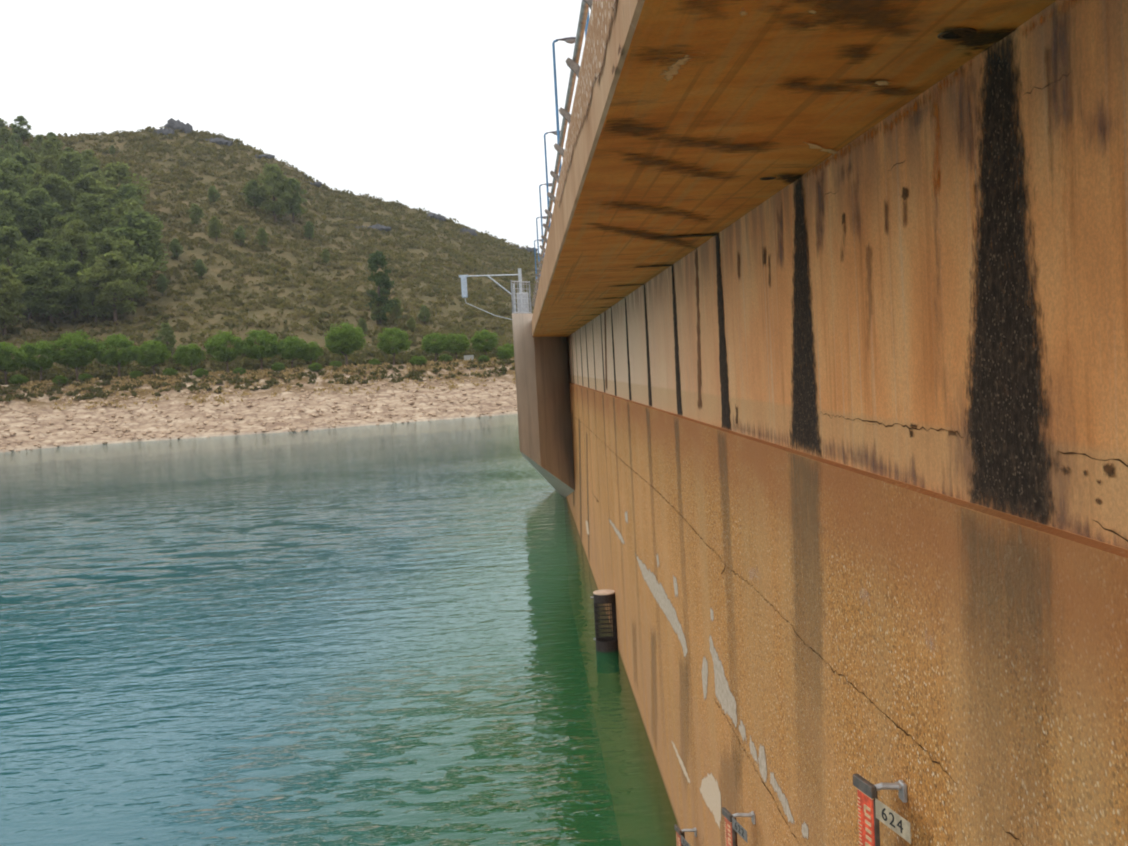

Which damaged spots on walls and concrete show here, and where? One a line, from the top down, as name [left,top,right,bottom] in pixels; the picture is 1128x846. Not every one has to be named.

water stain [790,0,909,36]
water stain [626,154,730,179]
water stain [607,118,774,153]
water stain [784,79,910,96]
water stain [598,201,731,430]
water stain [762,175,824,520]
water stain [944,29,1057,526]
crack [822,413,963,438]
peeling [635,554,687,657]
crack [576,418,953,780]
peeling [671,740,721,829]
peeling [702,636,808,839]